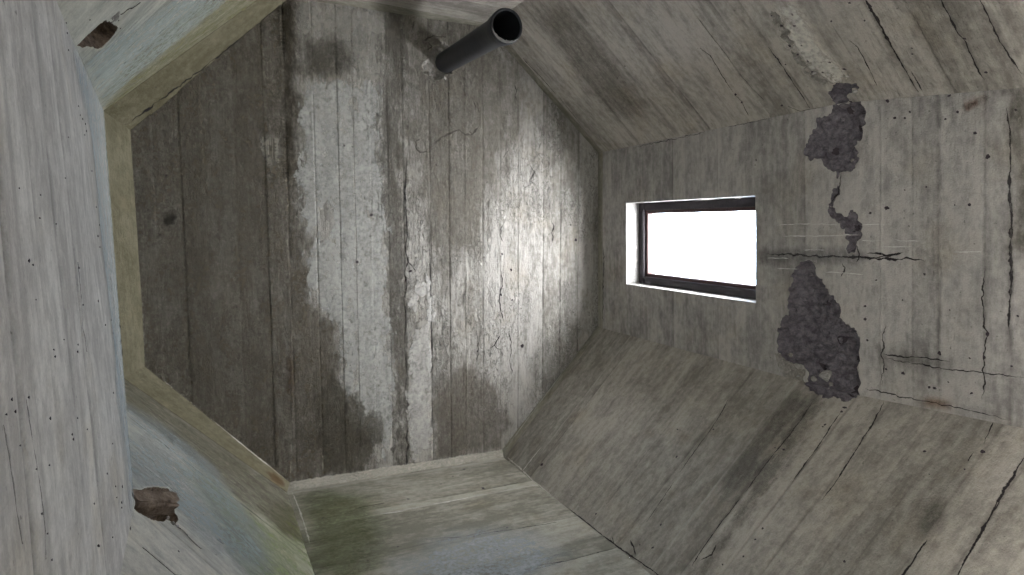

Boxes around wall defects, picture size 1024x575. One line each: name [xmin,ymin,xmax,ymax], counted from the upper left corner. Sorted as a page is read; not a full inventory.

spalling [68,11,137,51]
crack [865,0,922,91]
crack [941,0,985,80]
spalling [770,6,871,254]
damp [80,0,383,563]
spalling [775,260,868,412]
crack [772,246,921,276]
crack [822,108,1024,500]
spalling [146,513,179,528]
crack [958,458,1024,575]